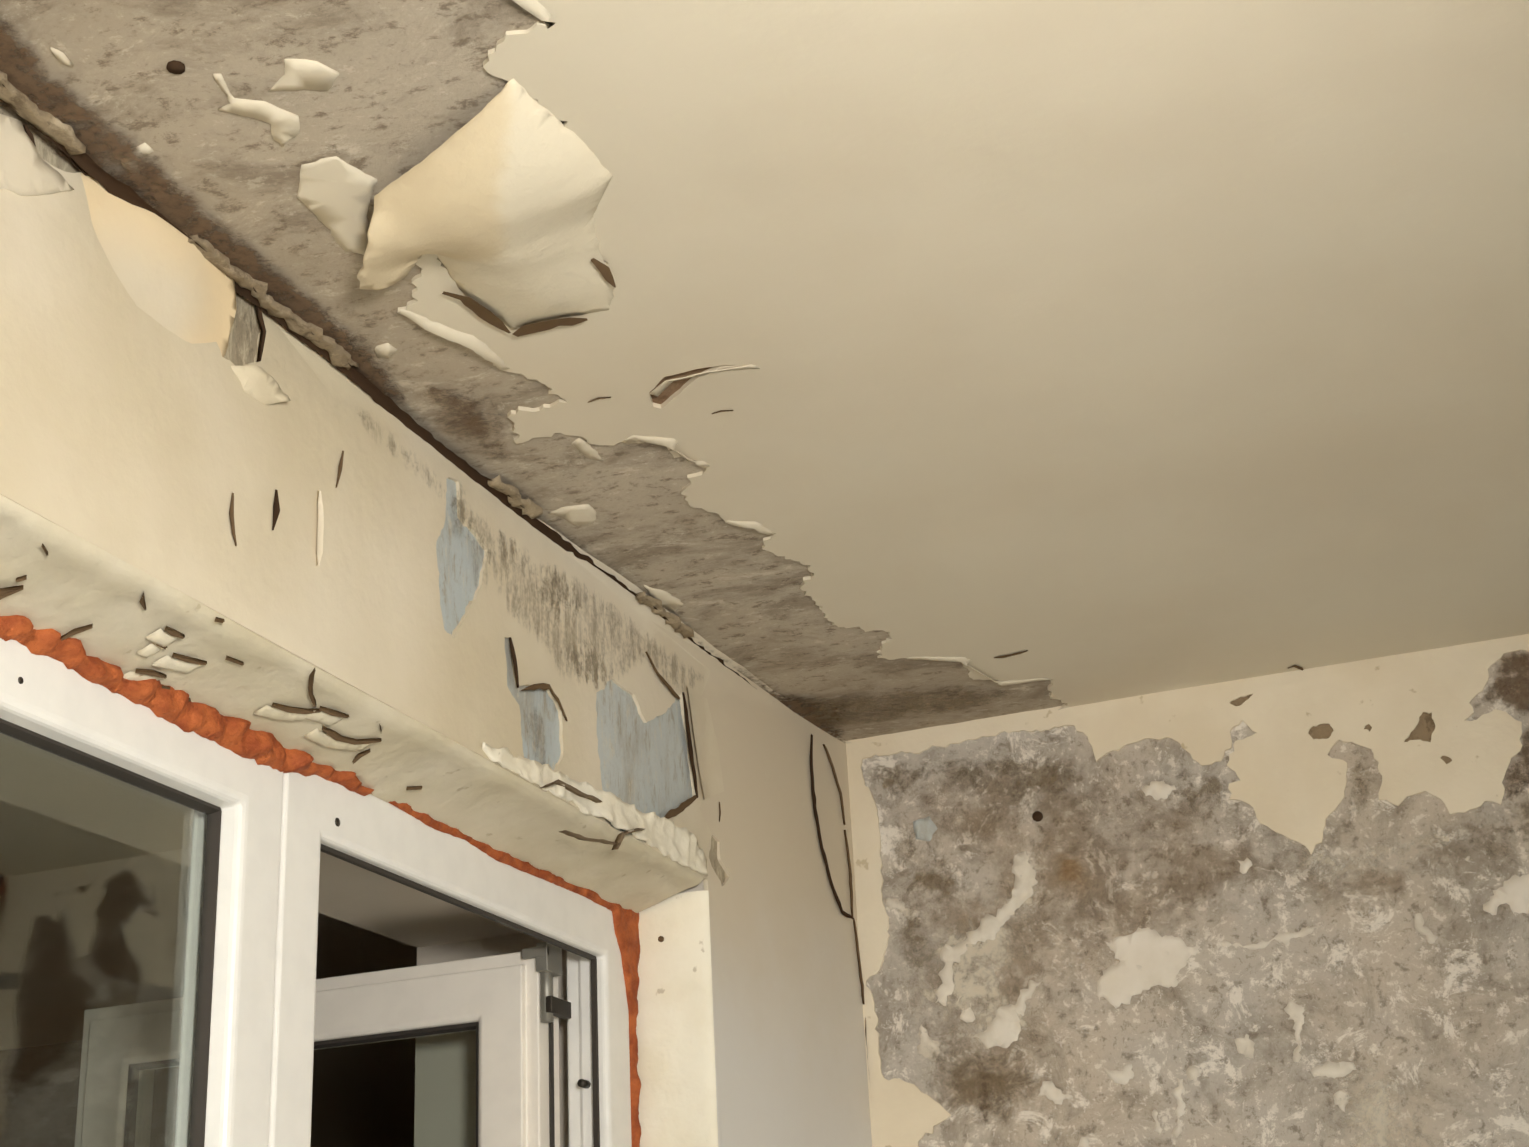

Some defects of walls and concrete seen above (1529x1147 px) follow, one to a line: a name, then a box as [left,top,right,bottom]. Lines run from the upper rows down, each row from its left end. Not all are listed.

peeling [0,0,1069,741]
peeling [861,650,1529,1147]
damp [1486,654,1529,711]
damp [1506,731,1529,825]